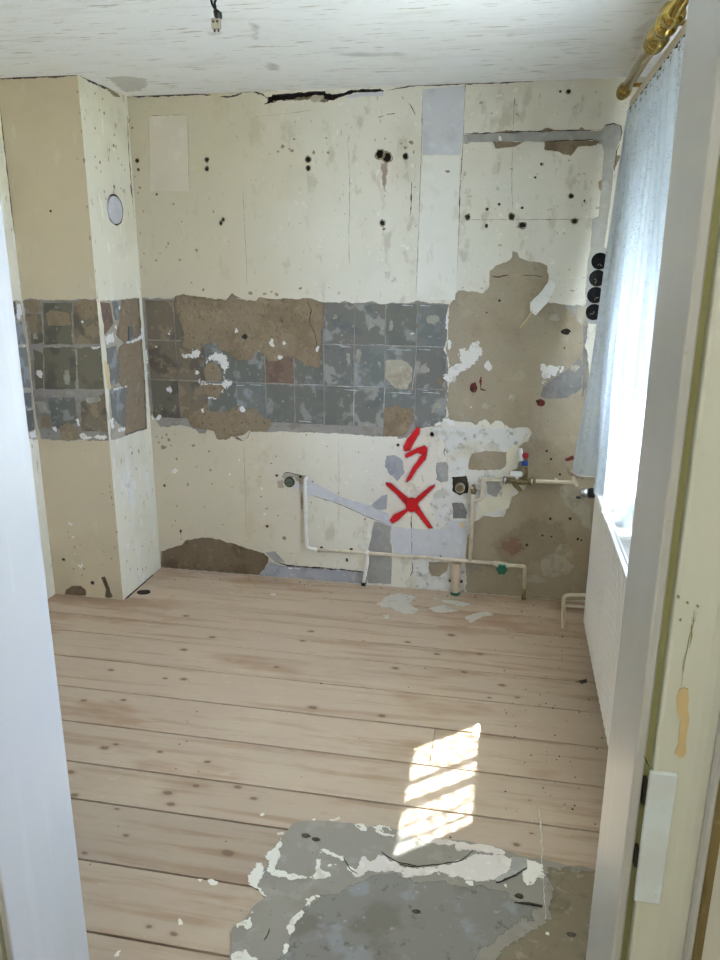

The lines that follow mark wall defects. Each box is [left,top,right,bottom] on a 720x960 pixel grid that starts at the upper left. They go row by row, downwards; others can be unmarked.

crack [0,75,622,286]
peeling [34,321,101,414]
flaking render [76,298,161,440]
spalling [168,287,325,368]
spalling [188,406,271,441]
spalling [404,251,595,601]
spalling [161,520,269,575]
crack [381,851,473,867]